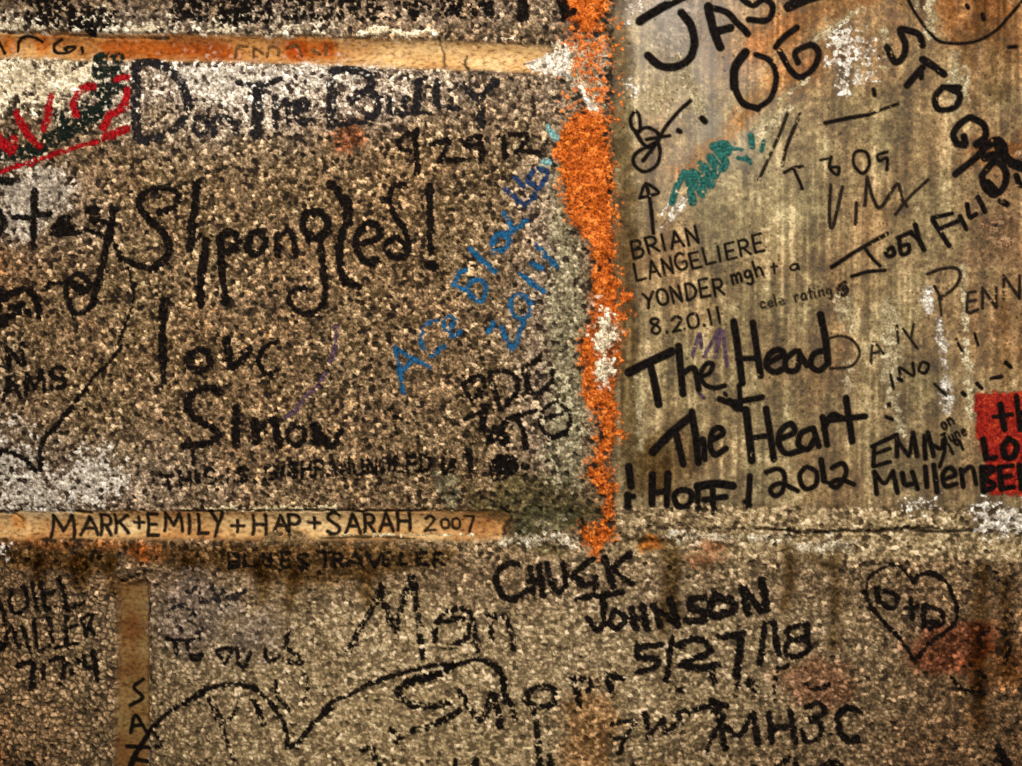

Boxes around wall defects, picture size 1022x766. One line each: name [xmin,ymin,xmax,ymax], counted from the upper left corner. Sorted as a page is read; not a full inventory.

damp [498,532,579,549]
damp [668,530,850,553]
crack [755,527,977,537]